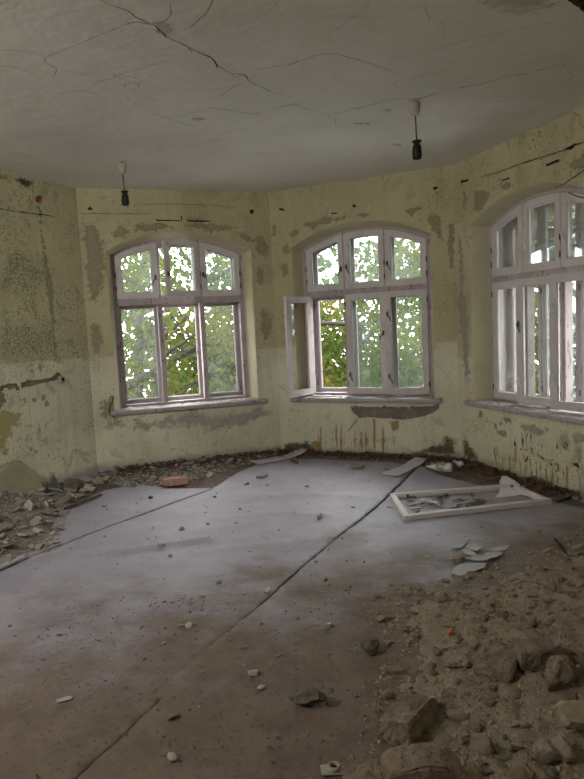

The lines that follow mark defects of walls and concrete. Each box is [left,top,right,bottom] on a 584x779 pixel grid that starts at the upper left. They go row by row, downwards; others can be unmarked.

crack [110,7,269,91]
leakage [81,225,106,301]
peeling [0,365,49,412]
flaking render [335,395,440,420]